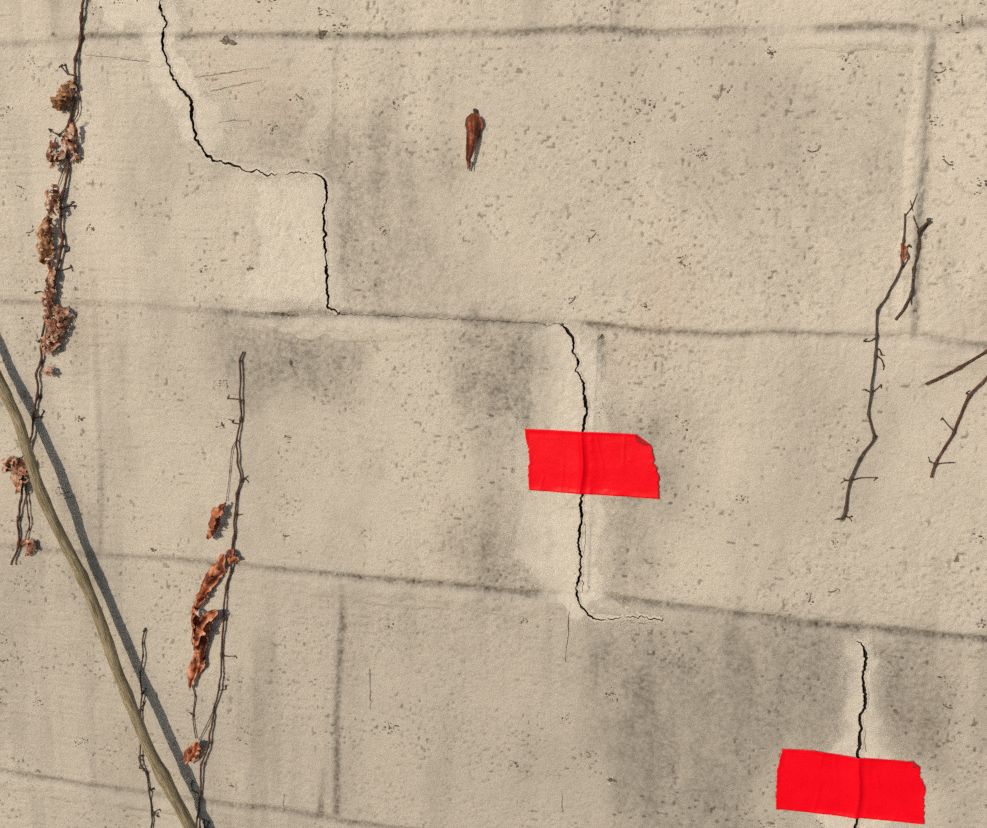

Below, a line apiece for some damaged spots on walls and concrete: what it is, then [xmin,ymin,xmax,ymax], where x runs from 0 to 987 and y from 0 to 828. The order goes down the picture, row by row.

crack [156,0,591,432]
crack [565,494,662,661]
crack [853,639,870,758]
crack [851,818,861,828]